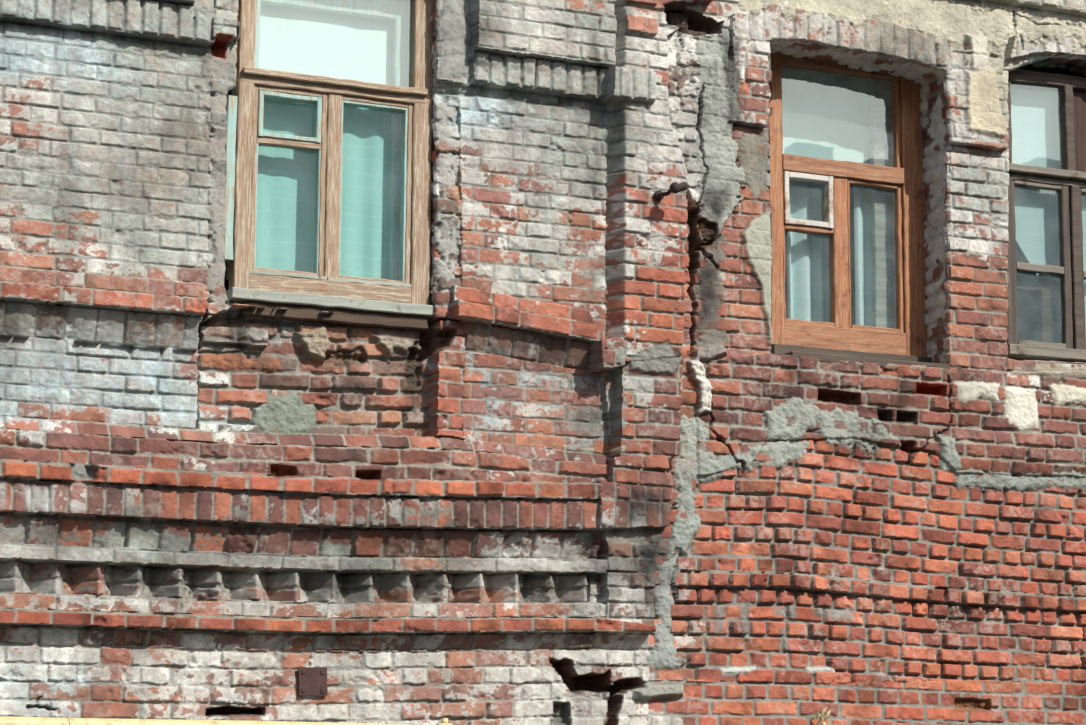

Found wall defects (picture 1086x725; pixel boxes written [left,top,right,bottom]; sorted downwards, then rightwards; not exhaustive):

spalling [210,32,236,61]
crack [686,82,720,357]
crack [904,374,954,467]
spalling [269,462,305,478]
spalling [354,468,388,482]
spalling [205,704,268,717]